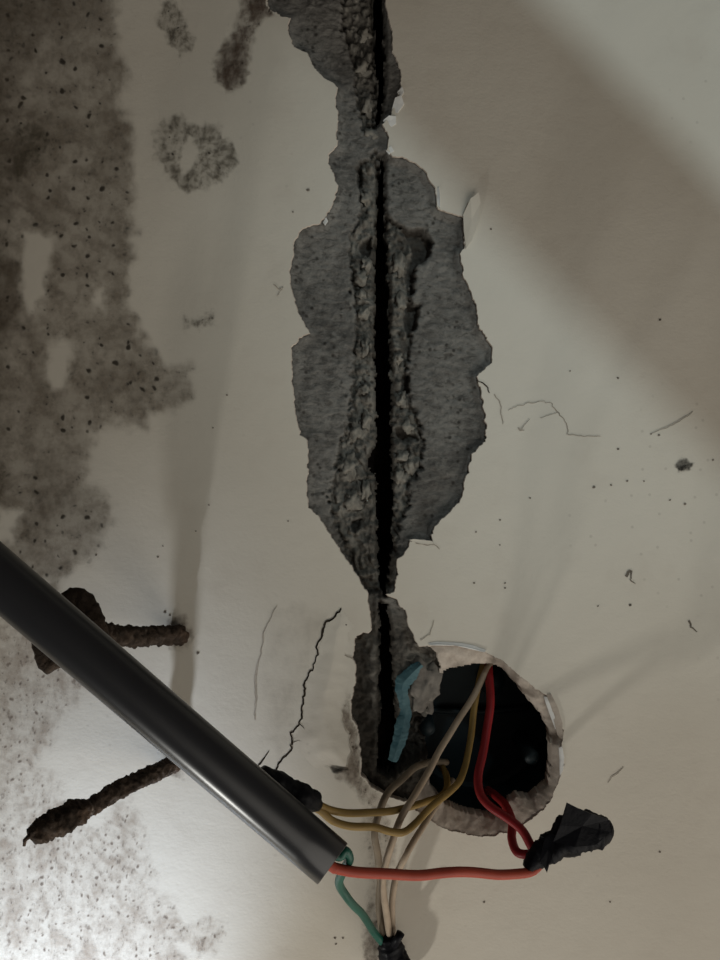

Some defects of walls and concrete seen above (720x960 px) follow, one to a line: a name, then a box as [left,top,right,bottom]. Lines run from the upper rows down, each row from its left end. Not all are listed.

leakage [0,0,130,317]
leakage [217,0,270,88]
crack [373,0,384,127]
leakage [0,296,92,571]
leakage [71,317,174,419]
crack [368,168,396,772]
flaking render [267,0,564,836]
crack [258,608,342,770]